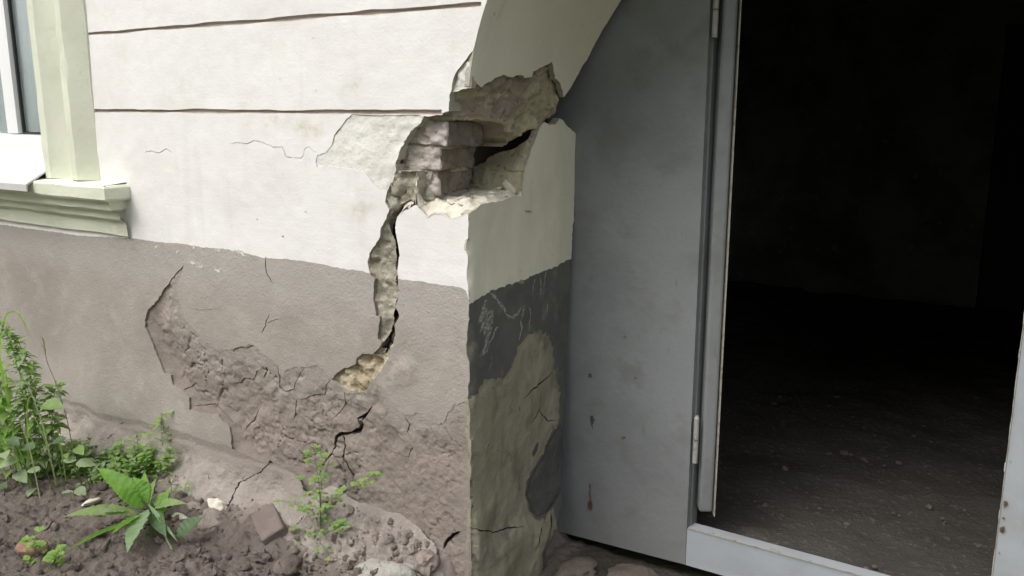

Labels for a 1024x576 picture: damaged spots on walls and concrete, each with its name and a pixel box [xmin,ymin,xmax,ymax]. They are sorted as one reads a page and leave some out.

flaking render [316,61,559,212]
leakage [479,294,531,355]
crack [184,383,261,428]
crack [233,316,413,487]
flaking render [147,245,561,576]
crack [519,374,555,422]
crack [228,461,273,506]
leakage [527,427,563,516]